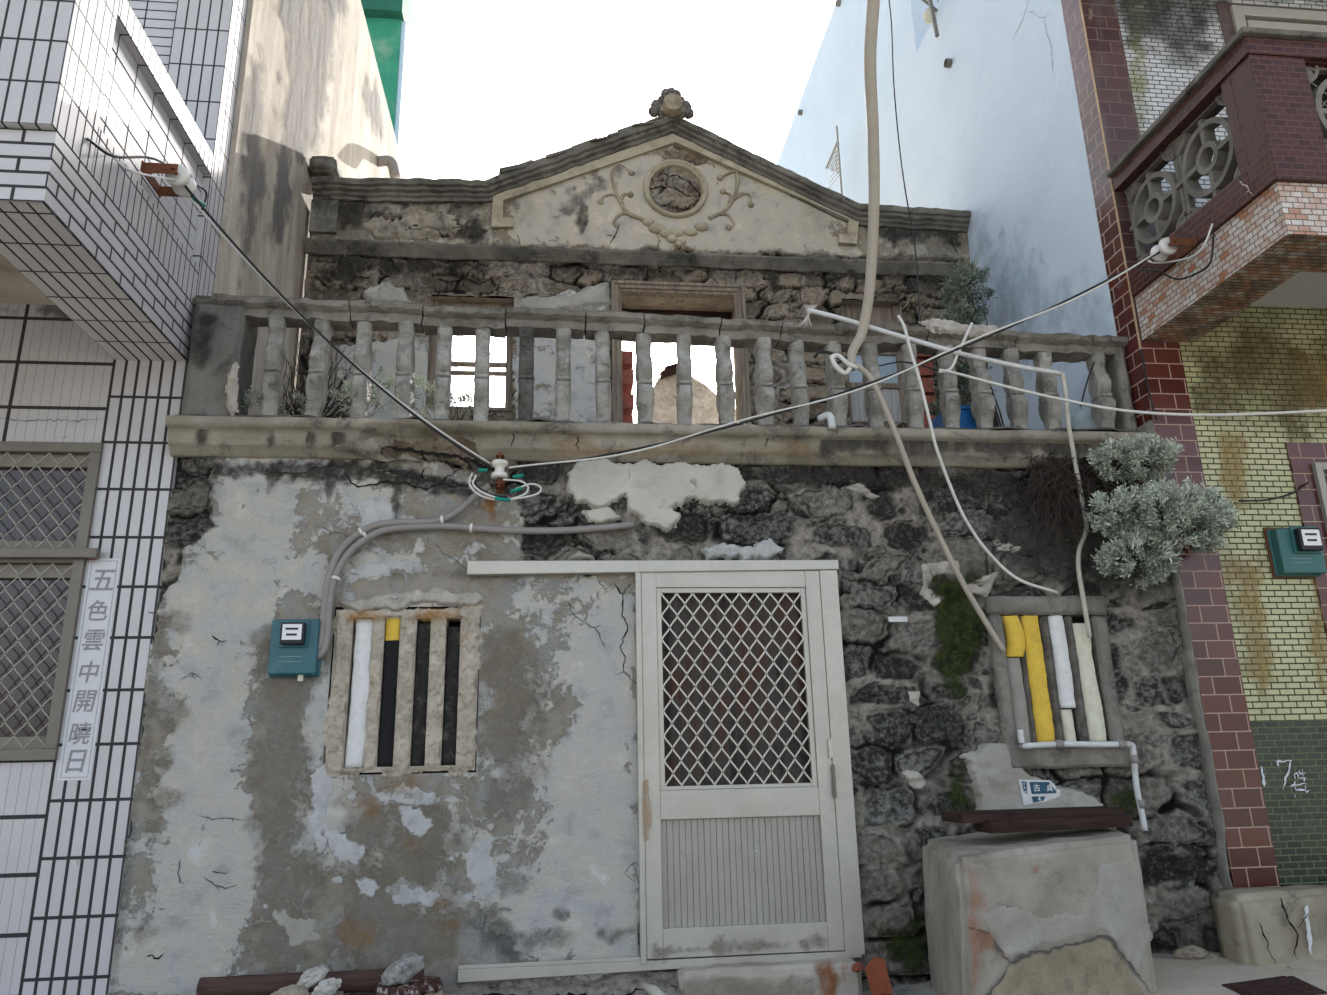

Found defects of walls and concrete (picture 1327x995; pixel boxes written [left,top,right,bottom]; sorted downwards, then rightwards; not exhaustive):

water stain [1121,0,1226,59]
water stain [241,0,348,250]
peeling [342,494,398,532]
flaking render [566,458,747,533]
spalling [340,559,485,612]
flaking render [567,551,595,561]
crack [568,580,636,683]
peeling [306,763,440,908]
corrosion [643,780,651,839]
peeling [436,834,497,902]
peeling [259,904,321,948]
spalling [991,938,1145,995]